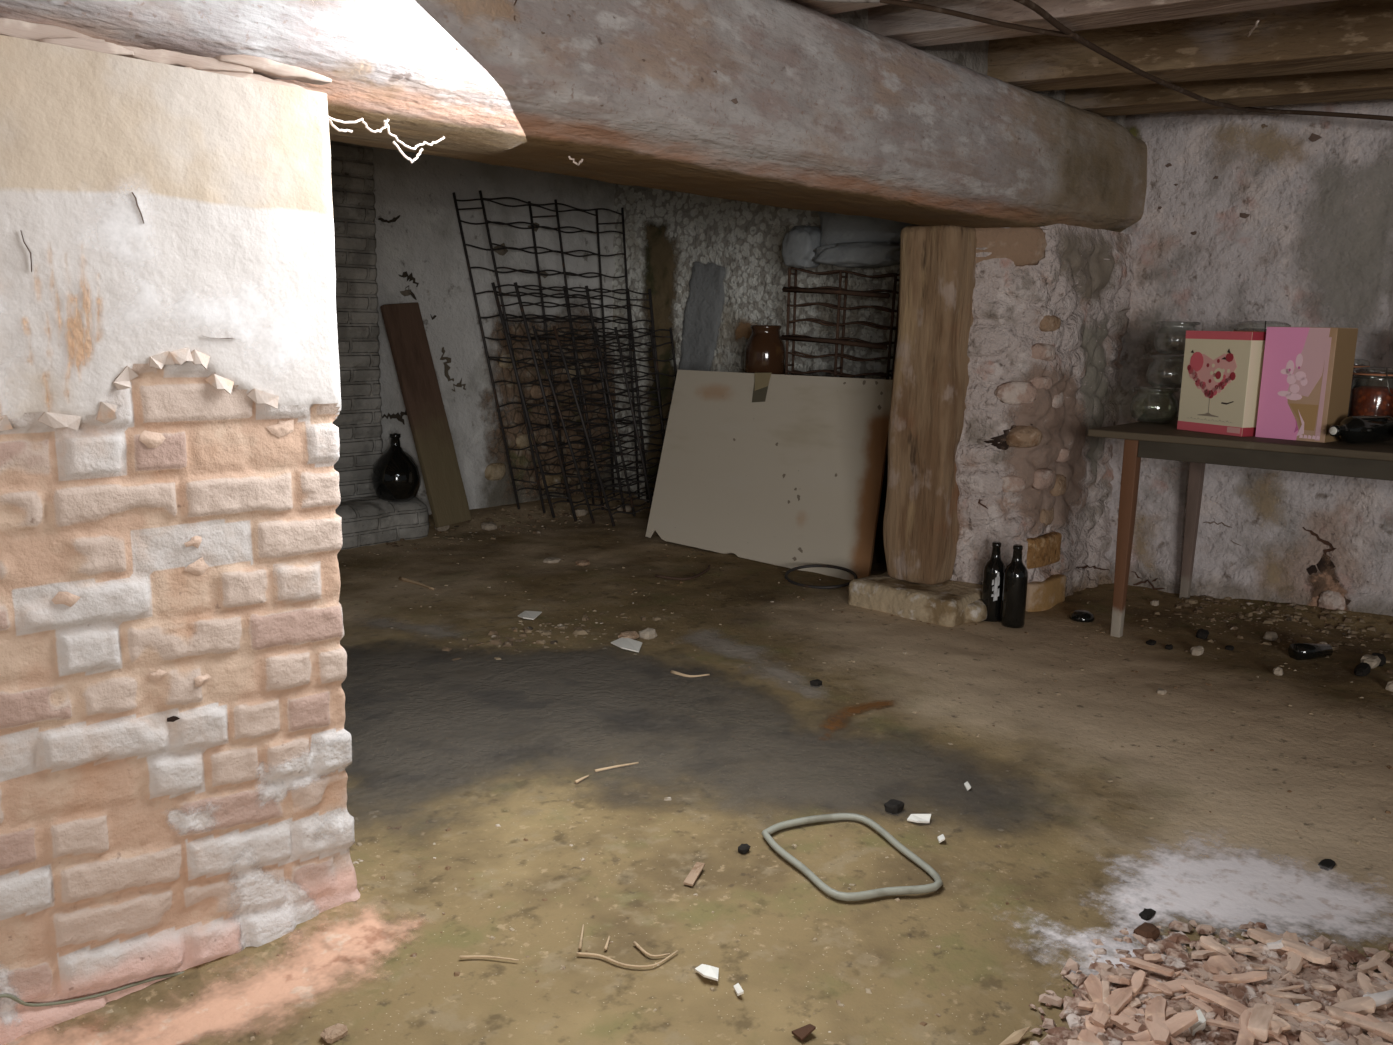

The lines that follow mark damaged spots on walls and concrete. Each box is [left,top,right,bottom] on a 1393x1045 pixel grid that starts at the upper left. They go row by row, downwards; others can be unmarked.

flaking render [38,347,294,438]
spalling [139,430,166,448]
spalling [52,592,81,607]
flaking render [1306,554,1351,611]
leakage [258,619,1045,838]
leakage [169,810,214,833]
leakage [231,852,319,950]